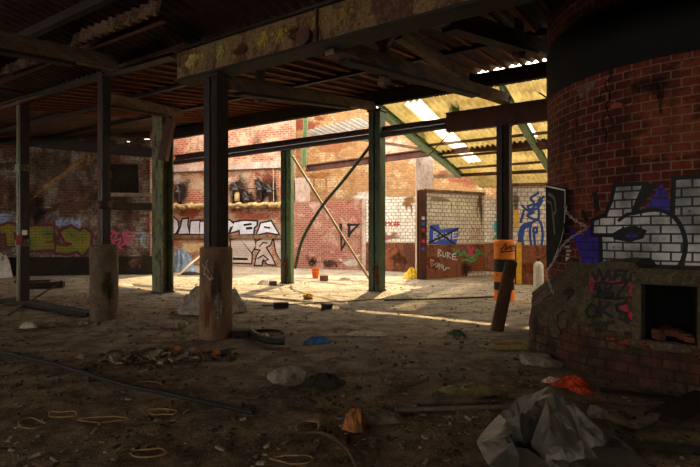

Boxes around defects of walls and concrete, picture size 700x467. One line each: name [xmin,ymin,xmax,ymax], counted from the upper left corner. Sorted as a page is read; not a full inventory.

crack [599,70,615,143]
rust [366,242,415,284]